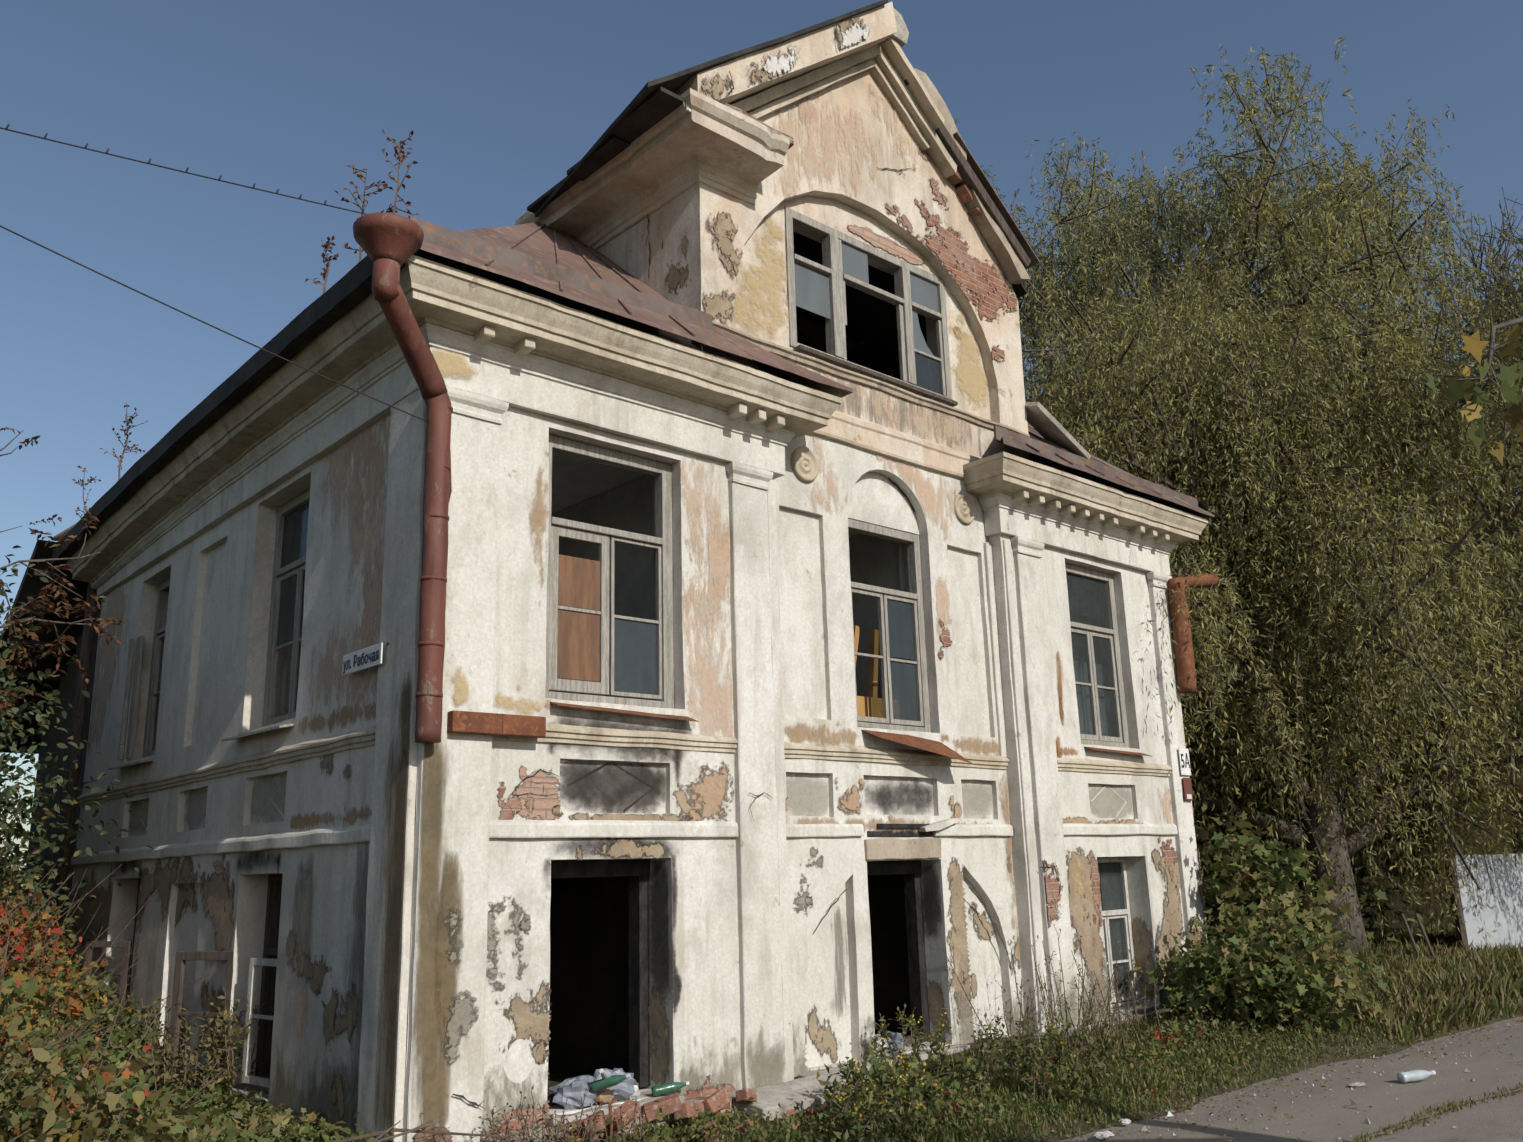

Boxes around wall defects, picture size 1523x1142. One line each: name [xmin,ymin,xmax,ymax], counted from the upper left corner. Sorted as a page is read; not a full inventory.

flaking render [683,45,798,149]
flaking render [833,15,871,49]
flaking render [848,82,1018,405]
flaking render [286,930,358,1051]
damp [268,673,463,1138]
flaking render [444,897,552,1065]
flaking render [497,762,734,860]
flaking render [805,1006,838,1064]
flaking render [928,858,1021,1040]
flaking render [1044,846,1106,1018]
flaking render [1063,816,1143,824]
flaking render [1132,789,1208,1002]